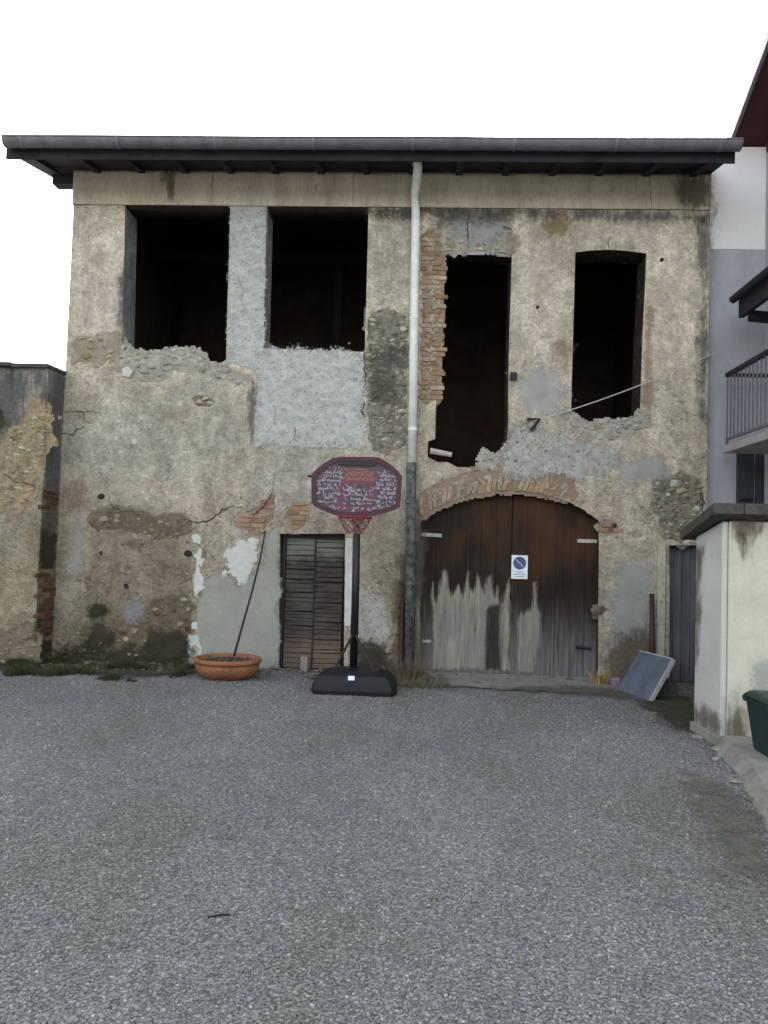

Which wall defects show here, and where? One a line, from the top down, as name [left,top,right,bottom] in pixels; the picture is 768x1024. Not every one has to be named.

water stain [377,207,559,218]
water stain [575,210,668,221]
water stain [678,177,716,266]
flaking render [71,324,251,386]
flaking render [362,212,515,455]
water stain [696,316,708,385]
flaking render [0,395,62,516]
crack [62,411,101,435]
crack [184,476,274,525]
flaking render [416,422,594,522]
water stain [733,519,762,556]
flaking render [81,493,205,664]